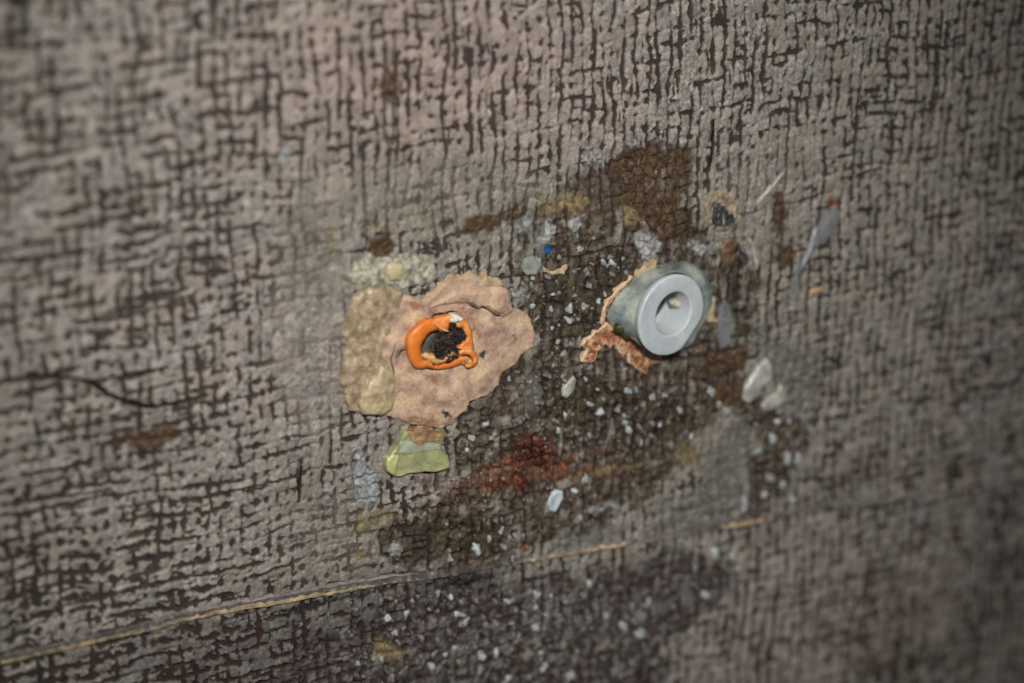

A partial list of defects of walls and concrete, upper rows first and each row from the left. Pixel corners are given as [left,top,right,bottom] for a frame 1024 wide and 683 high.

peeling [579,275,663,374]
crack [5,366,206,409]
leakage [258,137,807,683]
rust [469,434,593,493]